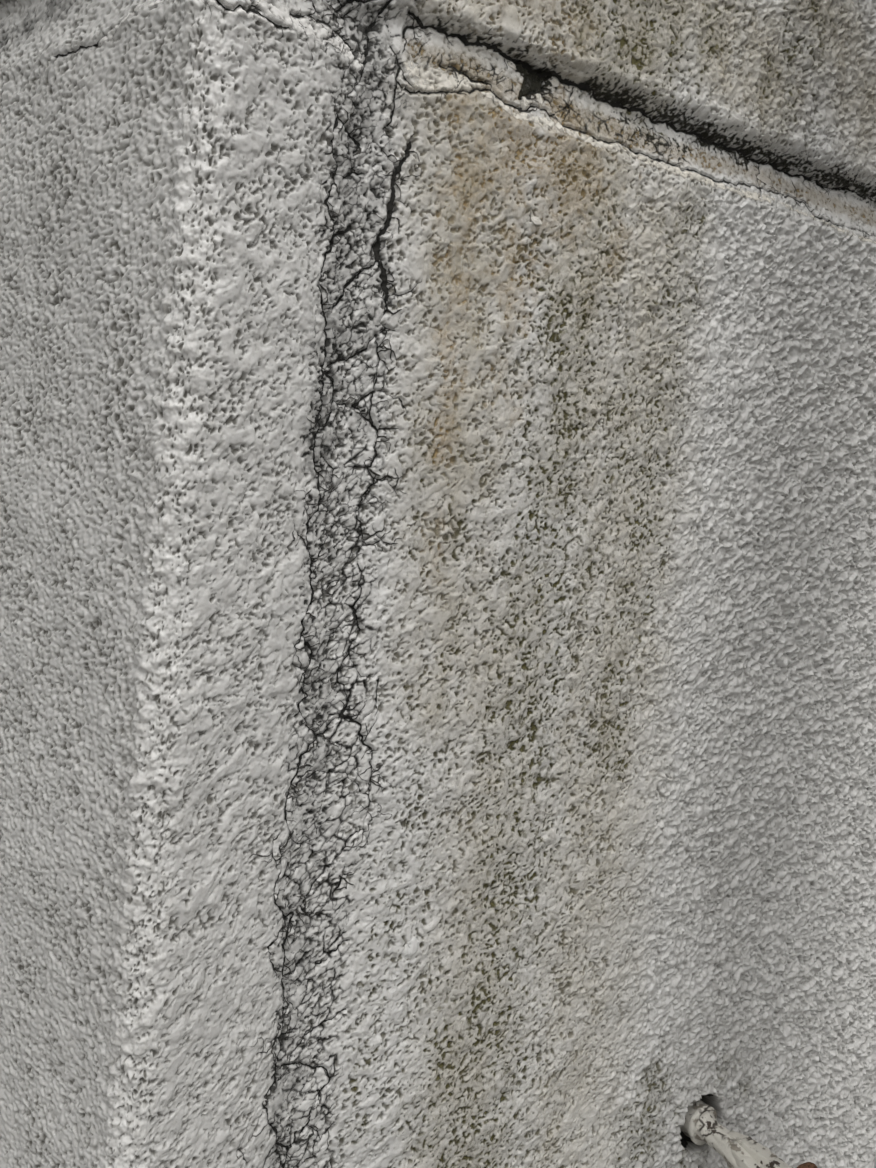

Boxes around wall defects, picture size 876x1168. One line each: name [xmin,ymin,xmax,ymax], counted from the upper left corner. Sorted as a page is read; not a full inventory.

crack [207,0,876,1168]